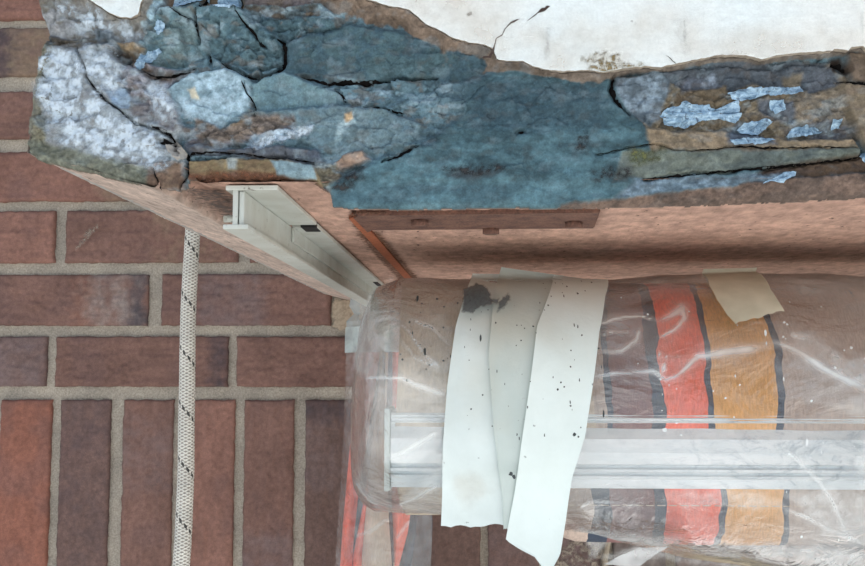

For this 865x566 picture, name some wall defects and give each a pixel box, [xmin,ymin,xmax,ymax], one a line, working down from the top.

crack [77,49,314,190]
crack [145,0,413,114]
crack [384,147,417,162]
spalling [27,0,865,212]
crack [482,6,550,58]
crack [830,64,865,85]